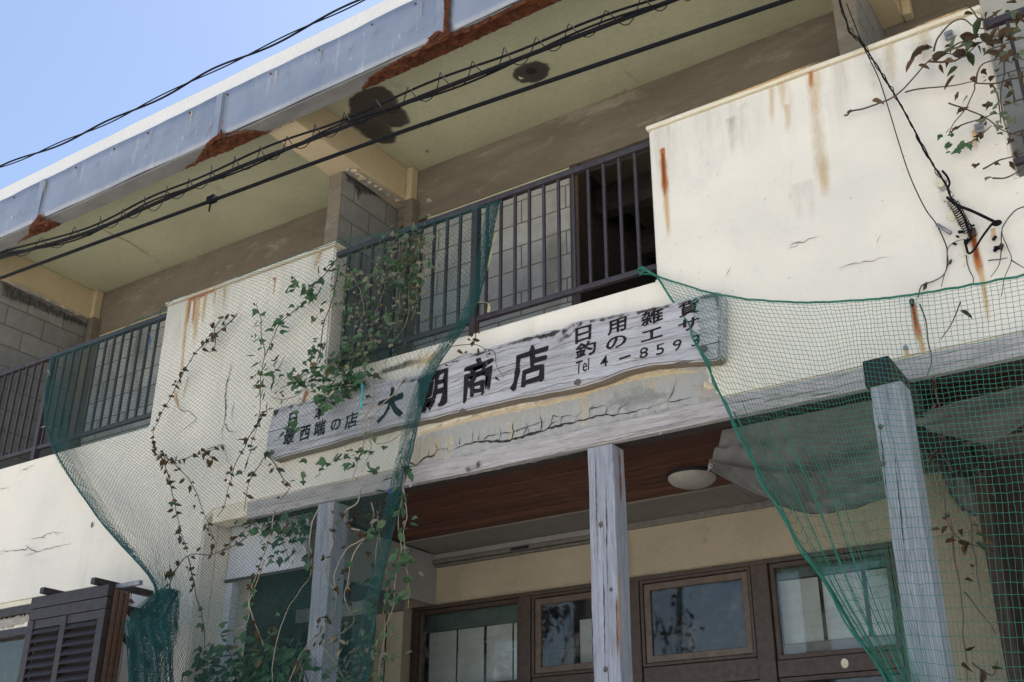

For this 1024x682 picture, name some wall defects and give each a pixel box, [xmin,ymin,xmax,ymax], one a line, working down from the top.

rust [660,148,669,227]
rust [971,236,987,306]
rust [173,282,225,406]
rust [903,305,925,358]
crack [416,382,691,465]
crack [5,531,70,556]